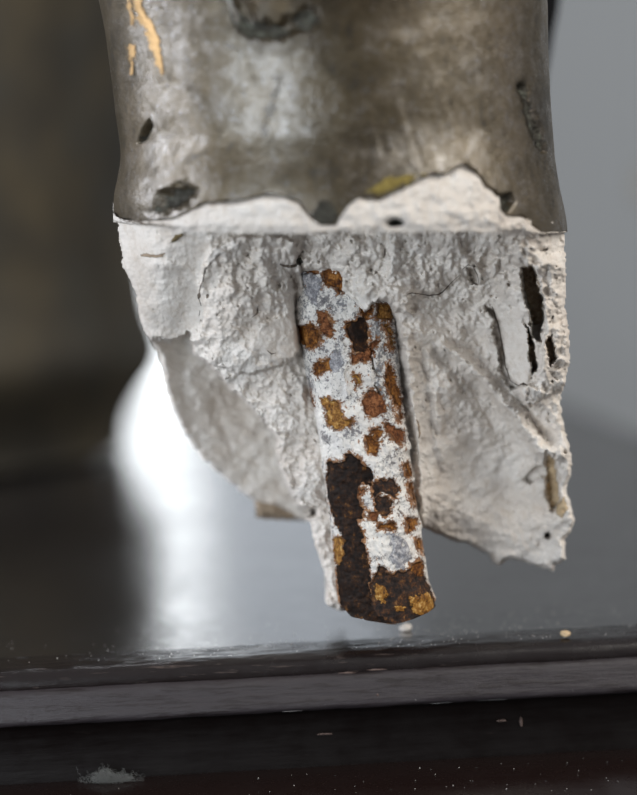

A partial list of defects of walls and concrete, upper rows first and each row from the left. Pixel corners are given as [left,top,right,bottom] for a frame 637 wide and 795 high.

spalling [312,201,339,226]
corrosion [305,270,344,292]
corrosion [298,311,335,348]
corrosion [311,357,331,375]
peeling [346,316,369,353]
spalling [523,265,543,372]
spalling [545,337,555,364]
corrosion [310,389,352,430]
corrosion [362,365,408,456]
spalling [546,454,561,507]
peeling [325,454,436,624]
corrosion [374,583,434,615]